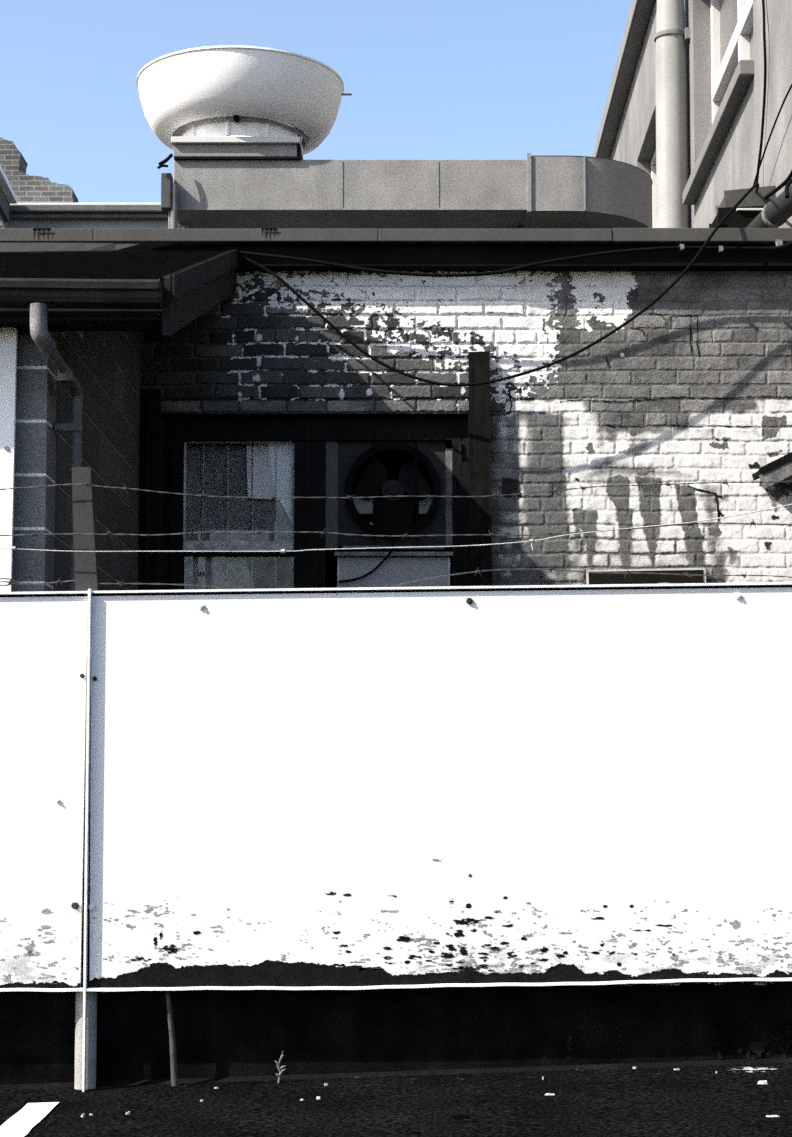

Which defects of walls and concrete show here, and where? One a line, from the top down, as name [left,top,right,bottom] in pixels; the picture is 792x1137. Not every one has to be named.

peeling [221,271,792,583]
water stain [499,413,598,585]
water stain [606,475,705,569]
peeling [0,891,792,988]